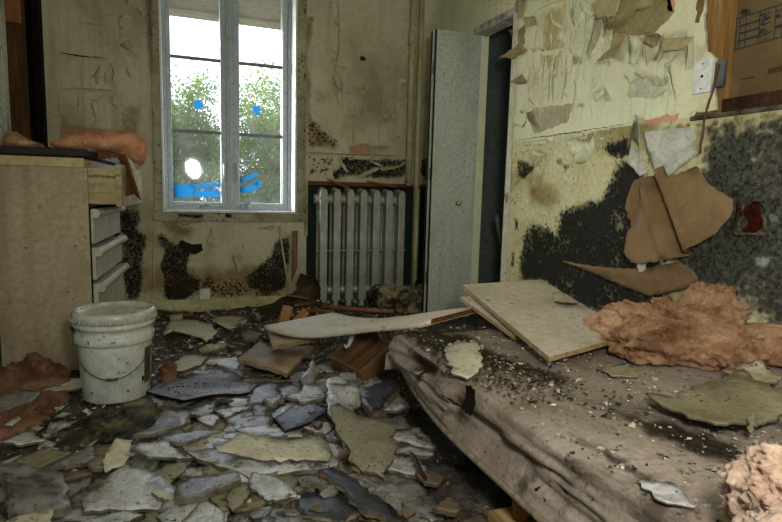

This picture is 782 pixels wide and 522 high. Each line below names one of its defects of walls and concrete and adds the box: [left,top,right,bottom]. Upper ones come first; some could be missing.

peeling [499,0,547,60]
peeling [574,0,694,99]
peeling [695,0,705,23]
damp [306,119,406,179]
peeling [511,103,583,134]
peeling [627,113,679,149]
damp [511,137,672,311]
damp [677,116,782,325]
damp [120,210,290,300]